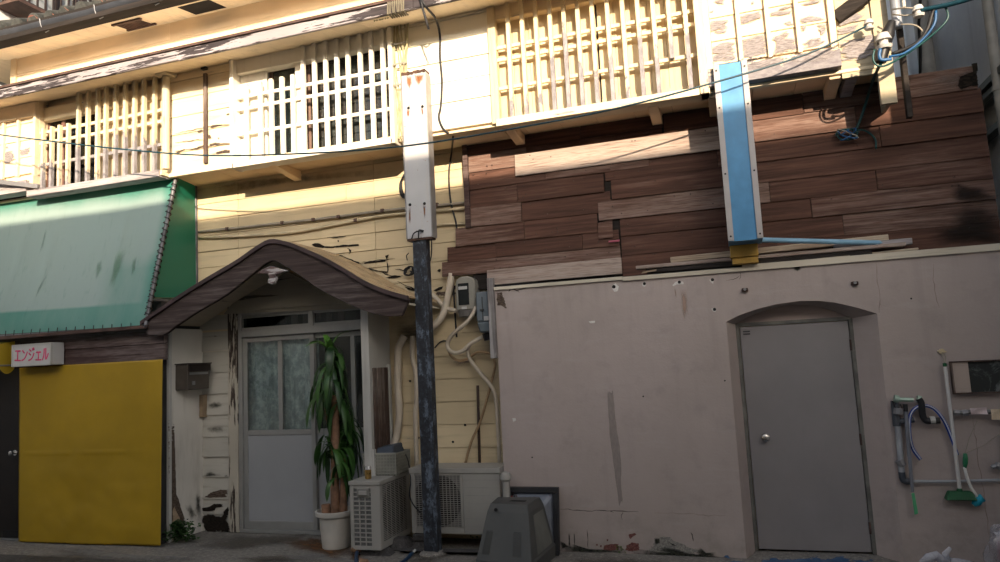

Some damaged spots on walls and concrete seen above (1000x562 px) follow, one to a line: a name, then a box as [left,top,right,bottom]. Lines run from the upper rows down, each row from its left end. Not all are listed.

peeling [710,0,875,69]
peeling [5,146,30,165]
leakage [941,186,995,241]